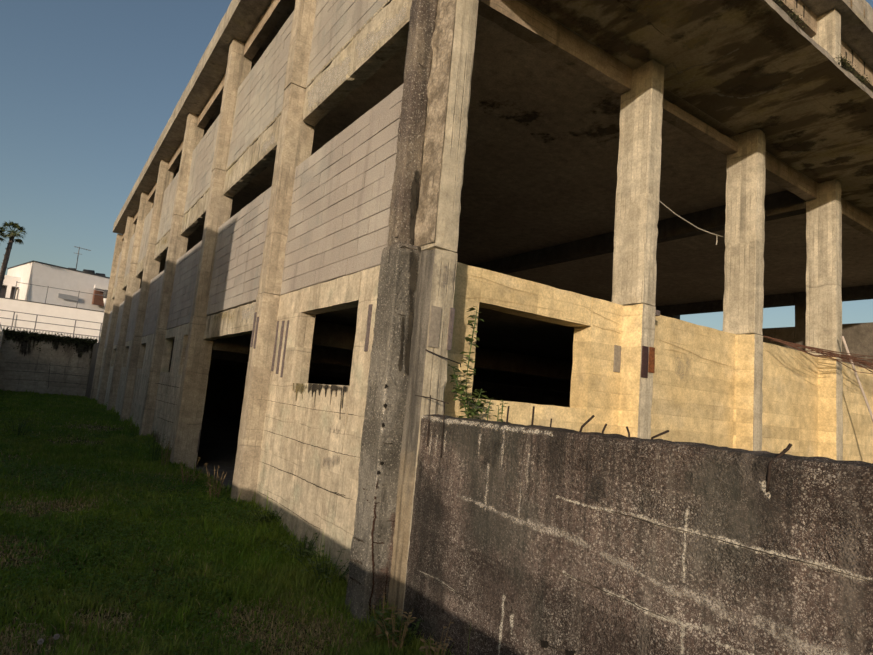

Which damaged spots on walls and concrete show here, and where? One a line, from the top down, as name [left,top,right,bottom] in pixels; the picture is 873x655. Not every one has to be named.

spalling [414,0,456,246]
water stain [571,125,620,138]
water stain [593,98,620,114]
water stain [711,67,802,99]
water stain [399,170,421,375]
water stain [293,383,347,419]
crack [252,399,393,615]
crack [556,495,873,582]
crack [540,561,754,655]